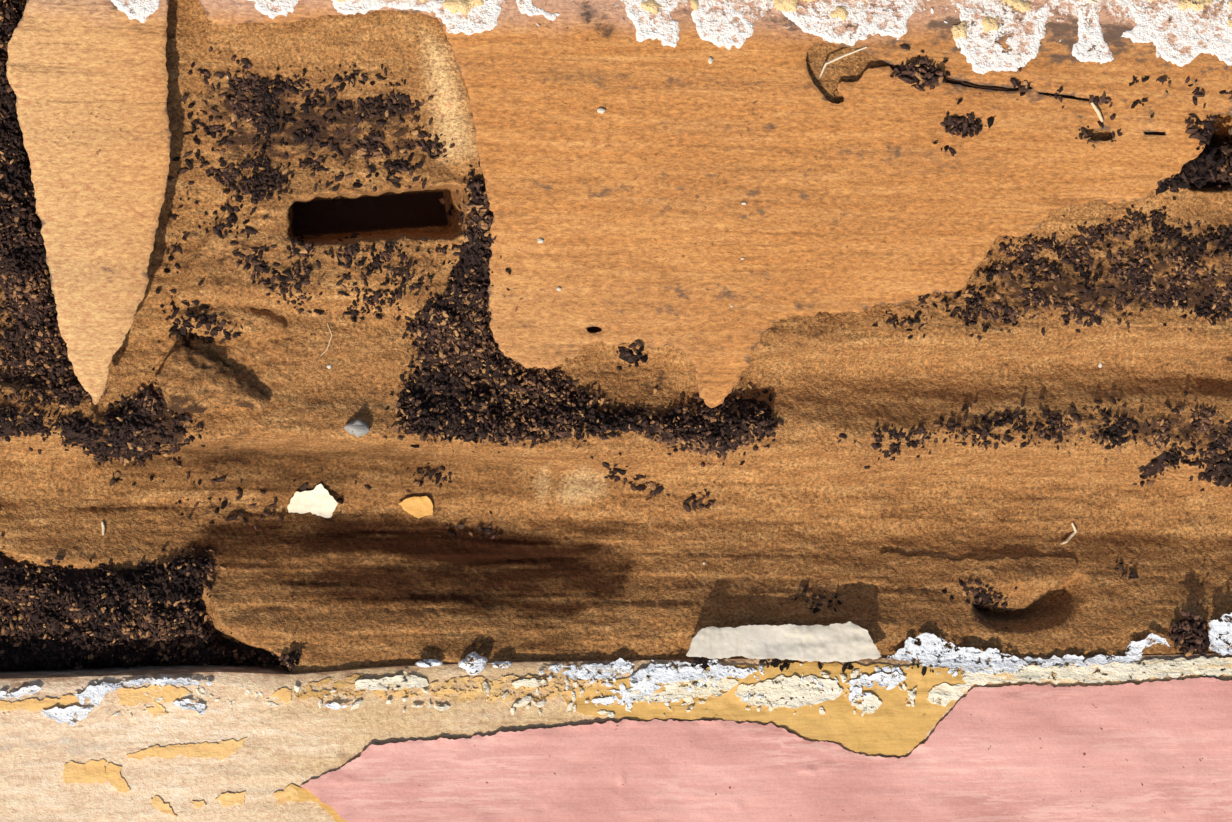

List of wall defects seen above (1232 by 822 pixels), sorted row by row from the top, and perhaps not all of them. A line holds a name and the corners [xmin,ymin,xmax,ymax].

peeling [110,0,160,23]
peeling [220,0,306,19]
peeling [332,0,560,35]
peeling [613,0,1232,75]
crack [943,76,1087,101]
crack [1144,129,1165,137]
peeling [398,496,433,519]
leakage [188,517,630,617]
peeling [0,613,1232,756]
peeling [62,738,246,793]
peeling [151,796,177,817]
peeling [273,784,346,822]